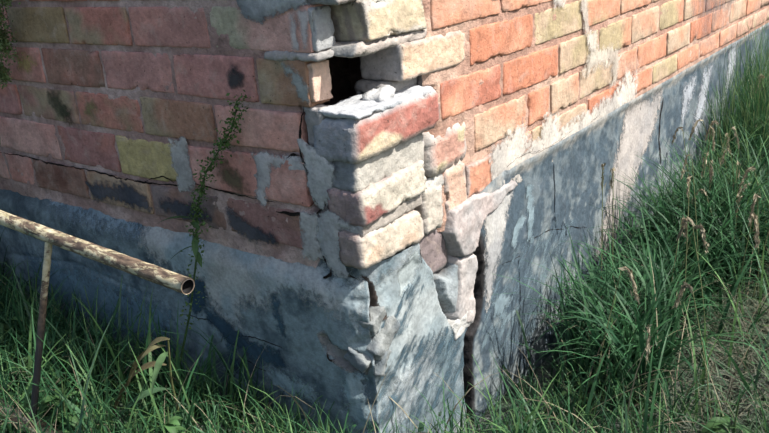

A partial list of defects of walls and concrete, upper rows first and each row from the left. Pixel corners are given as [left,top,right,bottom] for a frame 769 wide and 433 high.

crack [287,106,308,175]
crack [0,152,326,217]
water stain [482,47,638,383]
crack [316,238,358,280]
peeling [50,180,518,433]